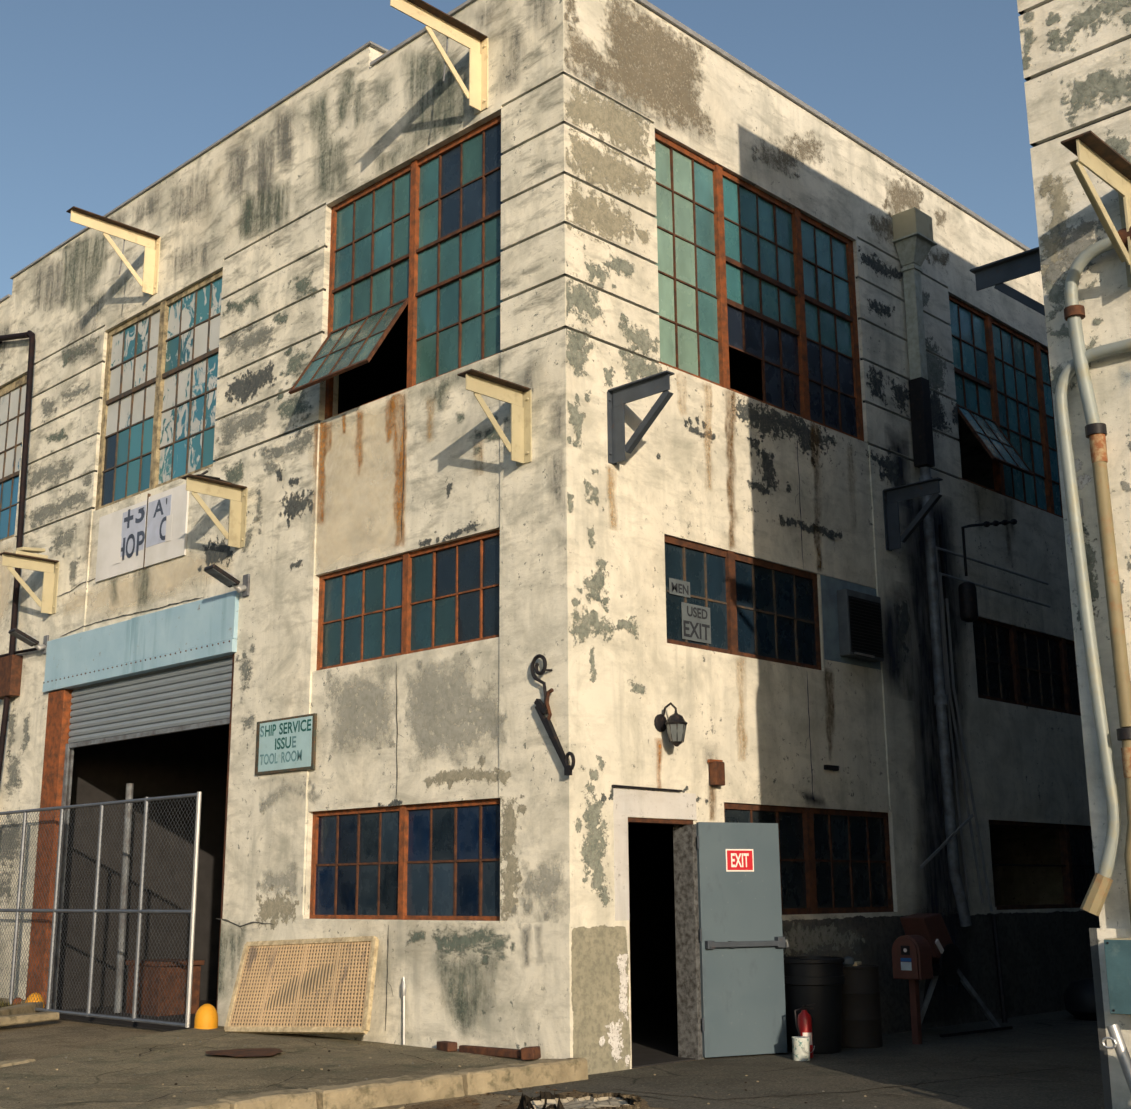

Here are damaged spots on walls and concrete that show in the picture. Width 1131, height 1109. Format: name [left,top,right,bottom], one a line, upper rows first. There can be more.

leakage [229,115,290,235]
leakage [312,77,361,191]
peeling [564,0,715,387]
leakage [36,235,104,307]
peeling [216,342,314,528]
rust [315,422,331,521]
rust [342,413,362,467]
rust [386,395,406,544]
rust [725,392,735,547]
peeling [568,525,639,682]
leakage [883,498,961,951]
peeling [575,755,615,907]